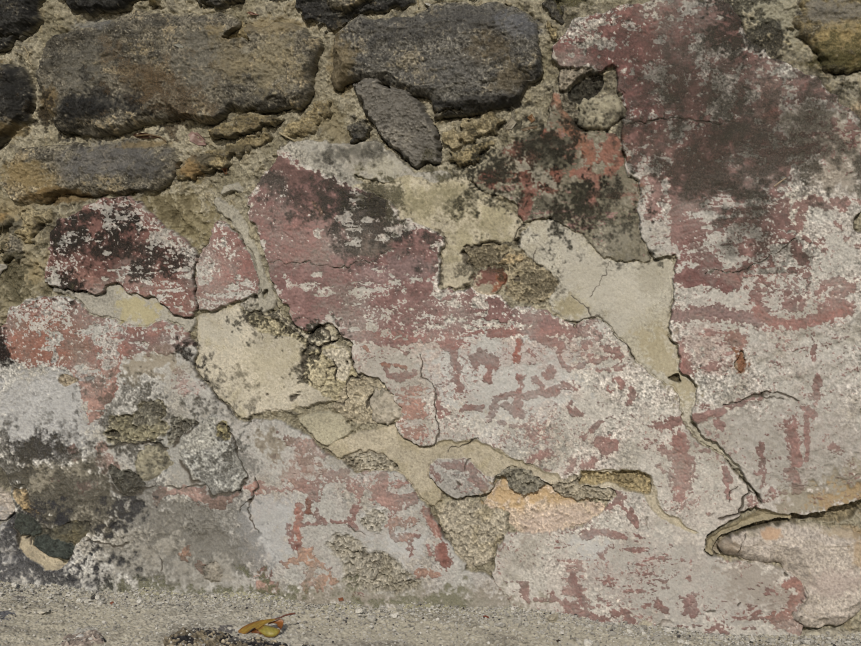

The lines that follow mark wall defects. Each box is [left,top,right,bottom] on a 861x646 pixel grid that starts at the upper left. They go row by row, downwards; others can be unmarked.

spalling [13,488,91,572]
spalling [94,399,200,495]
crack [105,380,260,533]
crack [420,354,479,486]
peeling [443,399,485,432]
peeling [566,400,591,419]
crack [719,460,762,554]
crack [723,391,800,406]
spalling [705,441,861,564]
peeling [775,361,832,495]
peeling [506,533,692,626]
peeling [675,576,807,636]